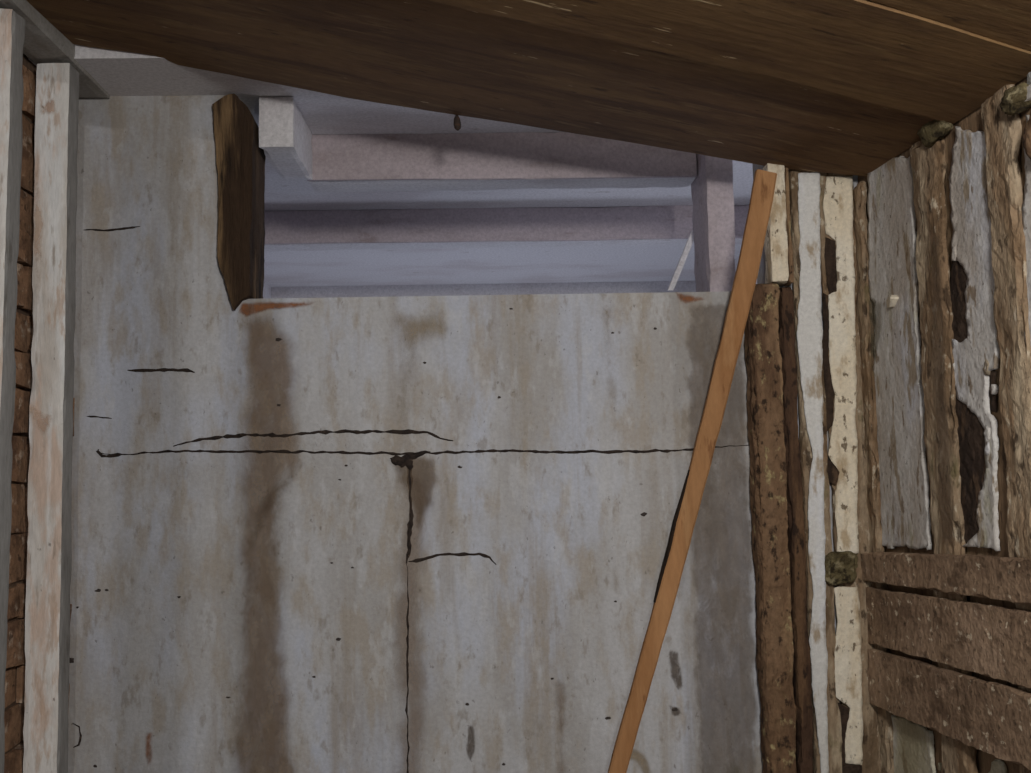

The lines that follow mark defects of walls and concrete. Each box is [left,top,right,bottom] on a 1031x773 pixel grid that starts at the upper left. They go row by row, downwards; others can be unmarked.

crack [72,723,82,748]
crack [85,224,140,232]
crack [127,366,195,374]
leakage [238,322,294,773]
crack [96,429,748,773]
peeling [797,172,863,773]
flaking render [867,156,932,550]
flaking render [891,715,936,773]
flaking render [949,126,1000,551]
flaking render [1022,149,1031,346]